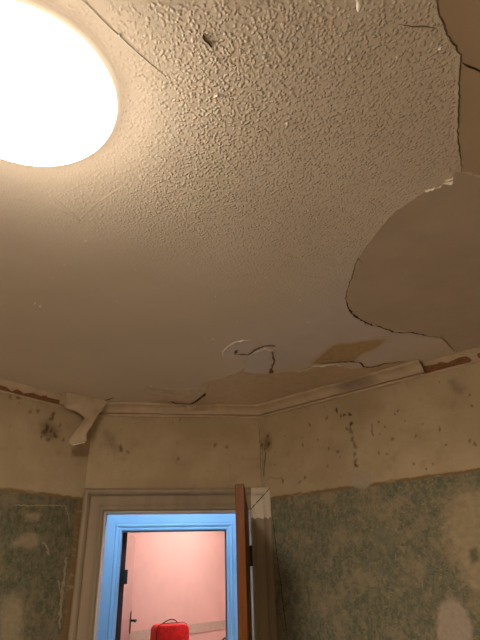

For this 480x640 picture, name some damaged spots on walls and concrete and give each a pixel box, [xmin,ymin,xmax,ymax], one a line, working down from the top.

crack [82,0,165,76]
peeling [305,0,480,374]
flaking render [0,386,64,406]